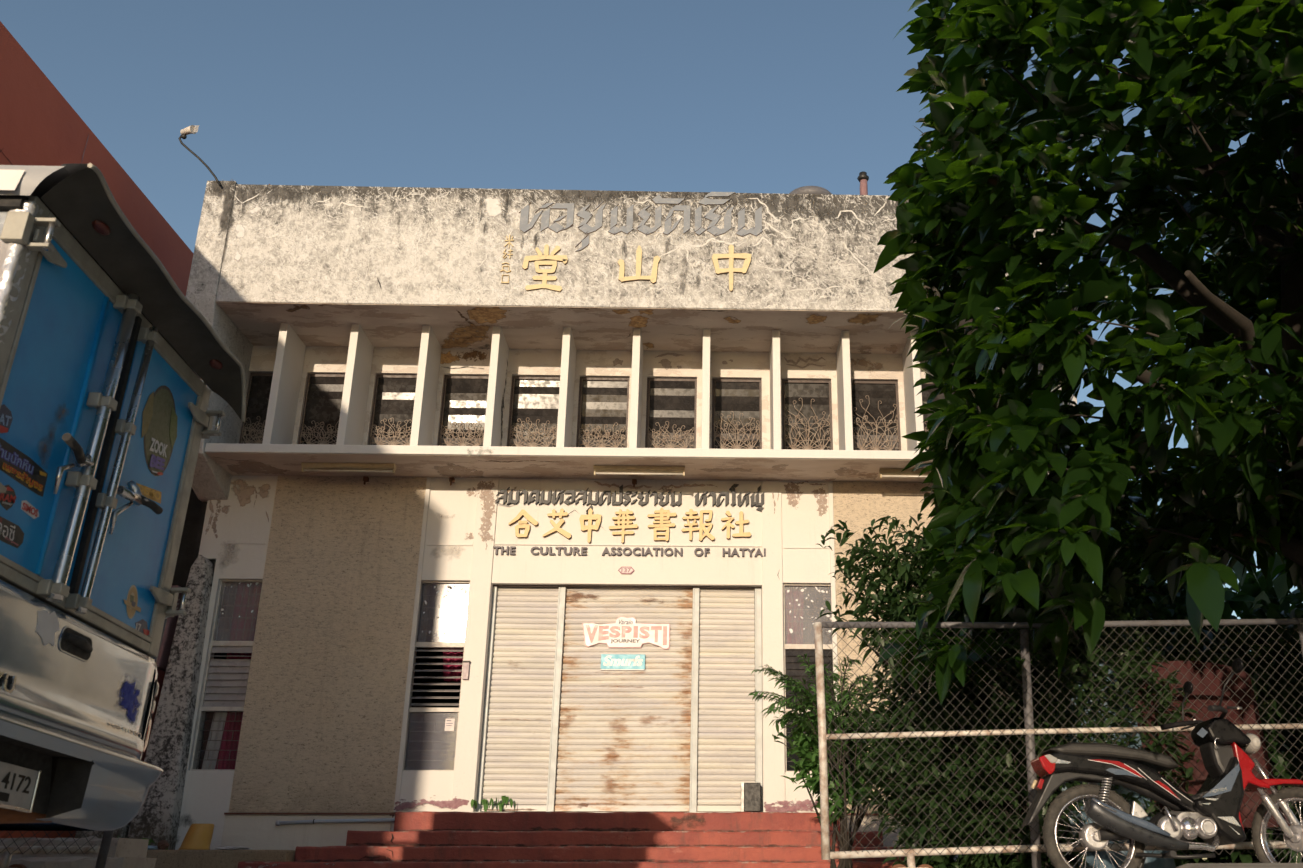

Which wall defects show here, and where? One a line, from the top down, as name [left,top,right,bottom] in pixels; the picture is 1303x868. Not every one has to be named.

leakage [560,190,907,231]
peeling [216,457,290,514]
peeling [434,460,552,550]
peeling [772,464,878,516]